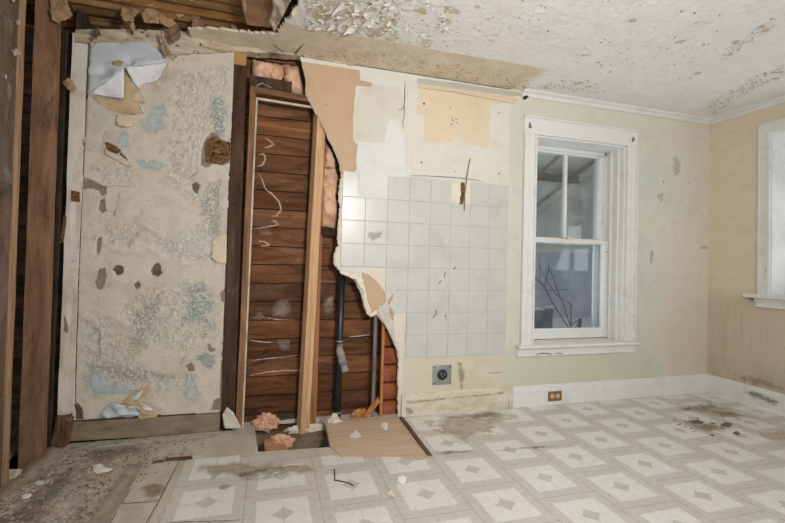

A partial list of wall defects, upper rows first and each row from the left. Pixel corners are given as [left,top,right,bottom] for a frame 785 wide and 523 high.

peeling [120,5,204,56]
peeling [269,0,555,48]
peeling [660,9,785,63]
peeling [84,99,133,167]
flaking render [201,133,231,168]
flaking render [83,177,107,213]
peeling [211,234,227,264]